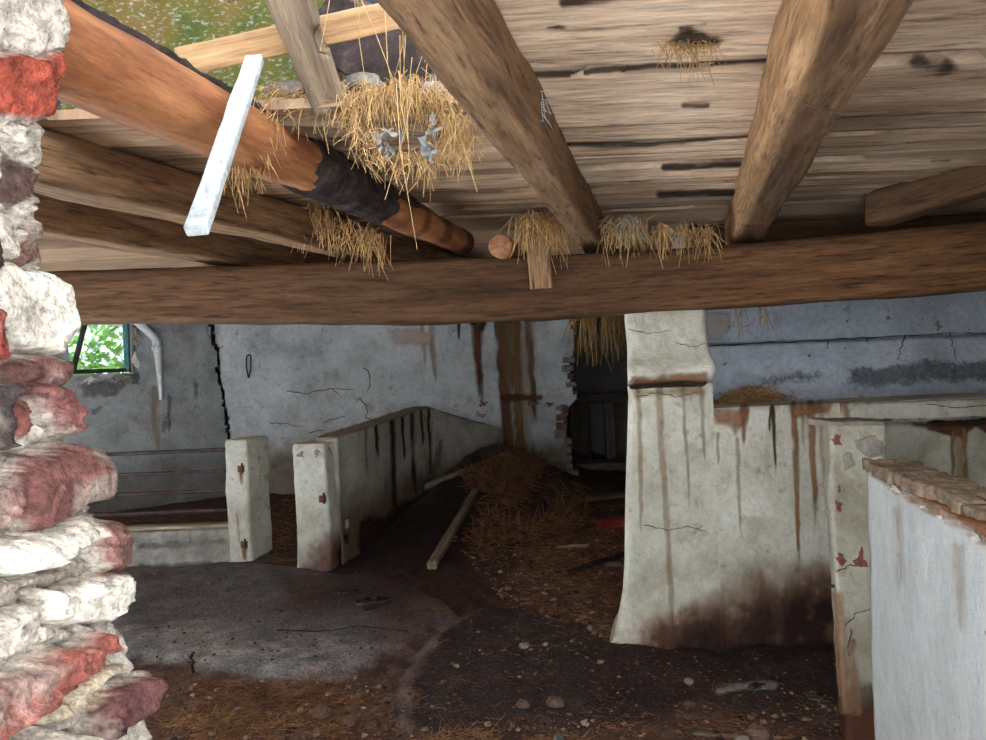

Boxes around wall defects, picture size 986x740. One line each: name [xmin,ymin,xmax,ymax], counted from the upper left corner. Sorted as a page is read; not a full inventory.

crack [206,324,229,440]
water stain [304,408,431,572]
spalling [527,357,579,476]
corrosion [714,405,749,442]
corrosion [791,401,830,550]
peeling [831,434,986,545]
corrosion [912,418,986,479]
flaking render [835,546,868,567]
water stain [641,565,875,740]